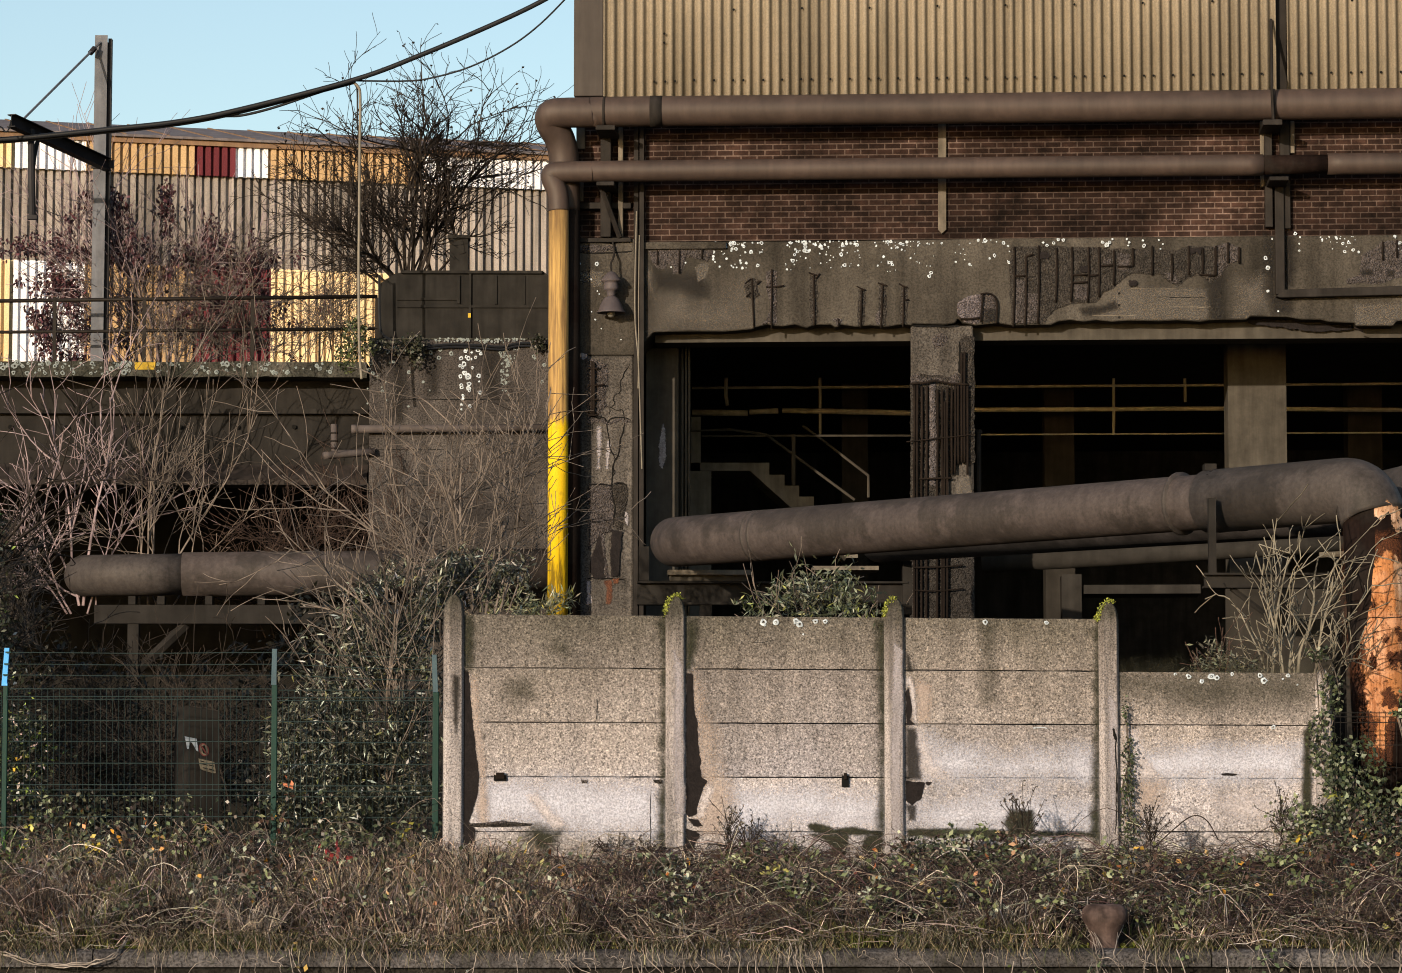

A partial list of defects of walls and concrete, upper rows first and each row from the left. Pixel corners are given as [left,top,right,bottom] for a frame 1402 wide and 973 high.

spalling [906,242,1240,498]
spalling [910,557,975,618]
damp [453,617,1312,859]